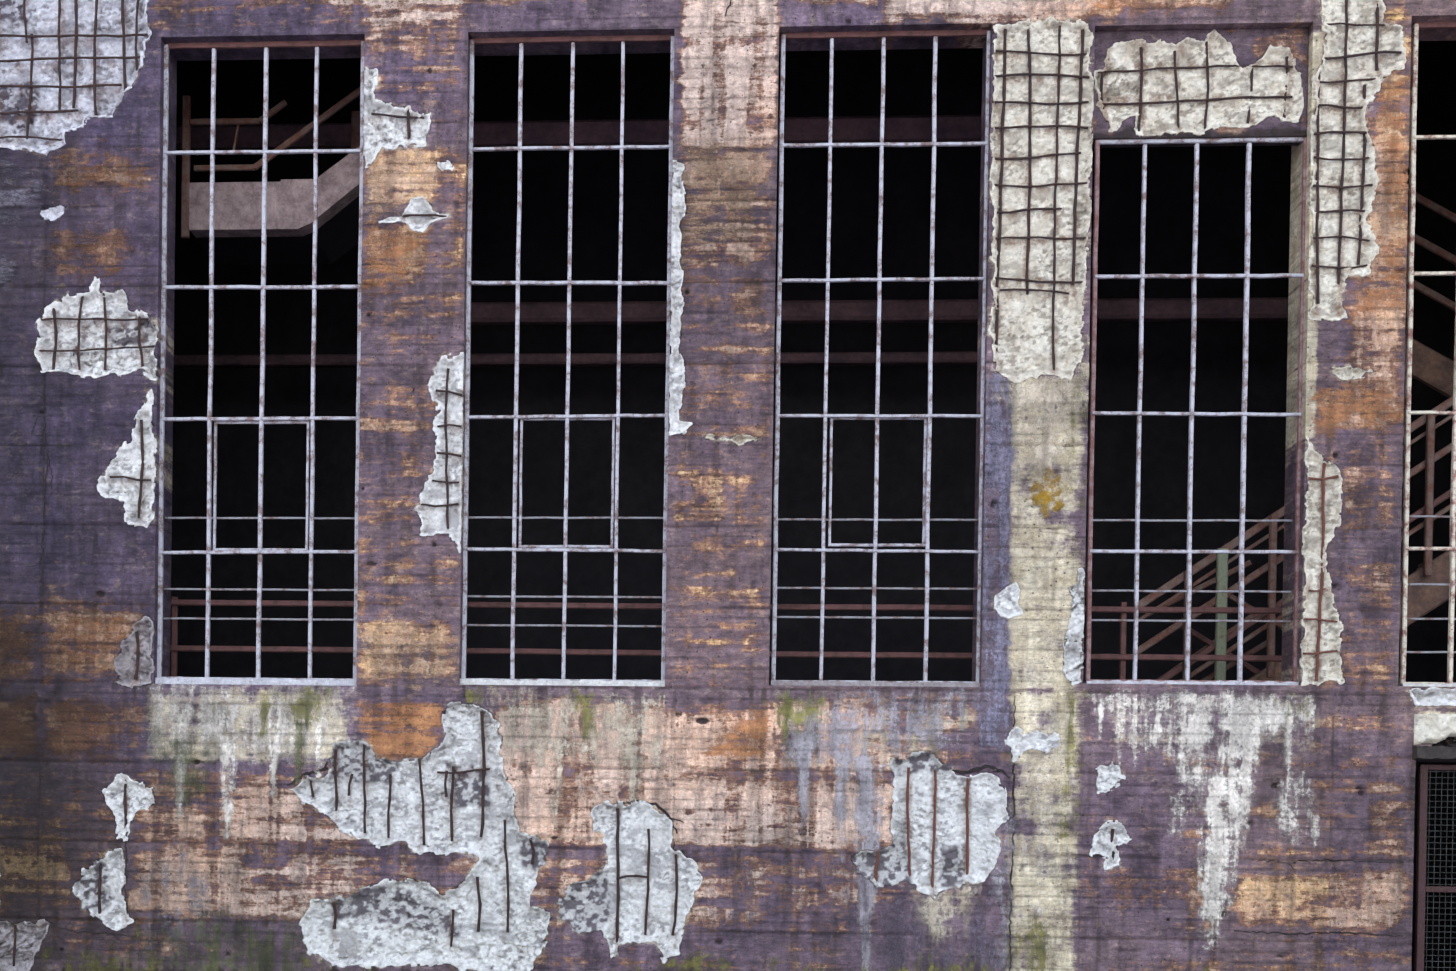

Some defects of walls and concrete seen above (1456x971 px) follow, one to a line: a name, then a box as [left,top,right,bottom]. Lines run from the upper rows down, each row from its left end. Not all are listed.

spalling [0,0,152,227]
spalling [987,0,1407,384]
spalling [34,277,159,528]
spalling [412,352,464,553]
spalling [0,919,50,971]
spalling [72,773,155,931]
damp [151,684,340,839]
spalling [291,701,703,971]
spalling [851,751,1009,899]
spalling [1004,727,1061,762]
damp [1087,690,1319,949]
spalling [1409,687,1456,707]